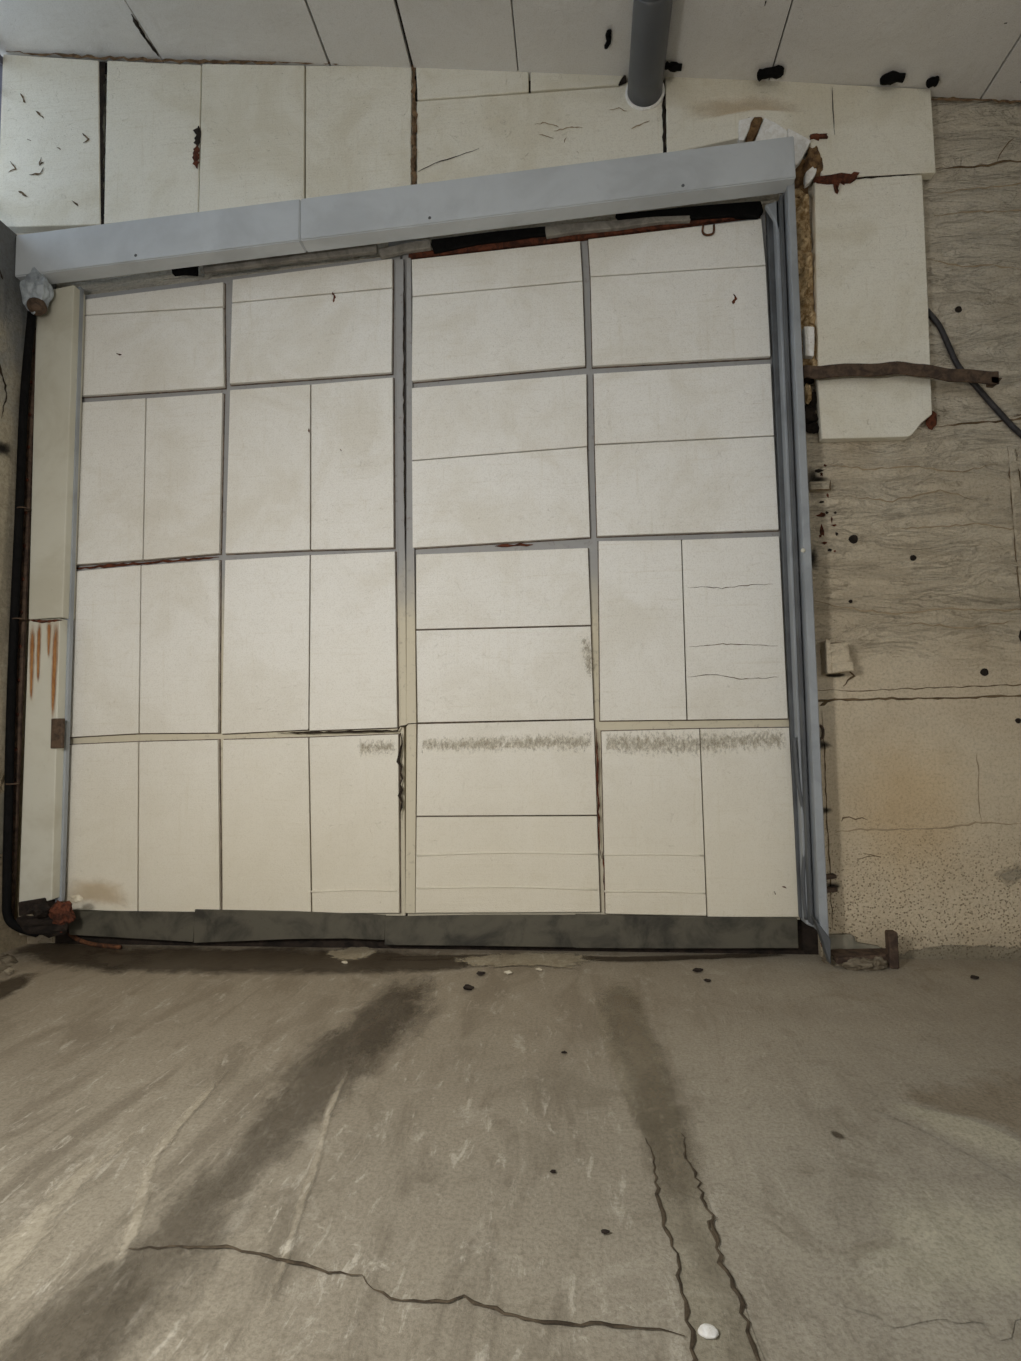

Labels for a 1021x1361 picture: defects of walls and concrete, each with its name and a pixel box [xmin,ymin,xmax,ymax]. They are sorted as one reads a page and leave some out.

crack [0,365,8,414]
corrosion [28,619,62,713]
water stain [18,943,486,973]
water stain [580,953,778,961]
water stain [866,1057,1021,1142]
crack [128,1133,761,1361]